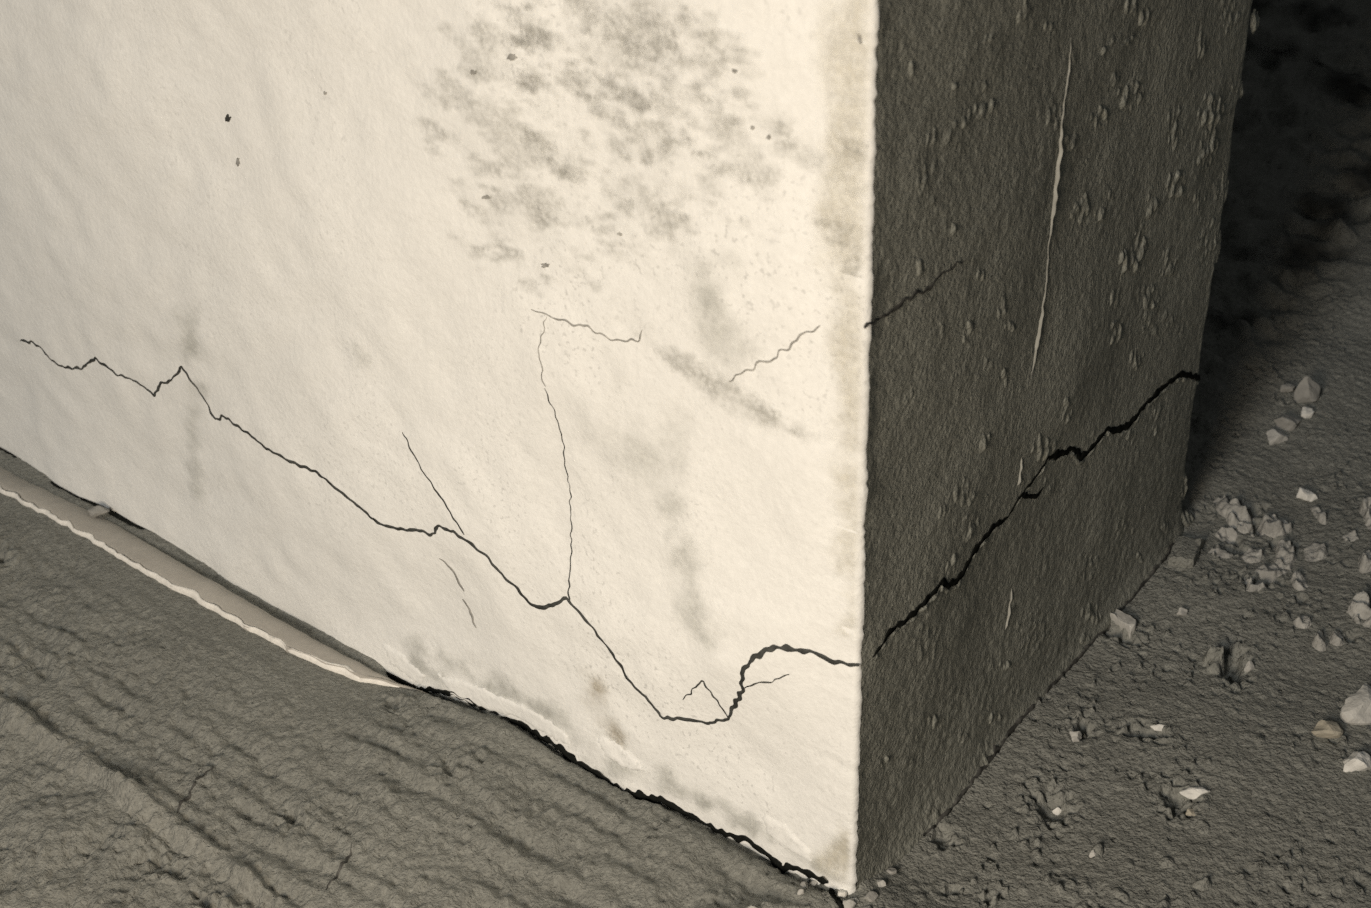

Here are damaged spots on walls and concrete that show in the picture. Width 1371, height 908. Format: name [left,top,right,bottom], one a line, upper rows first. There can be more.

crack [863,258,966,329]
crack [20,309,1200,725]
crack [411,684,855,908]